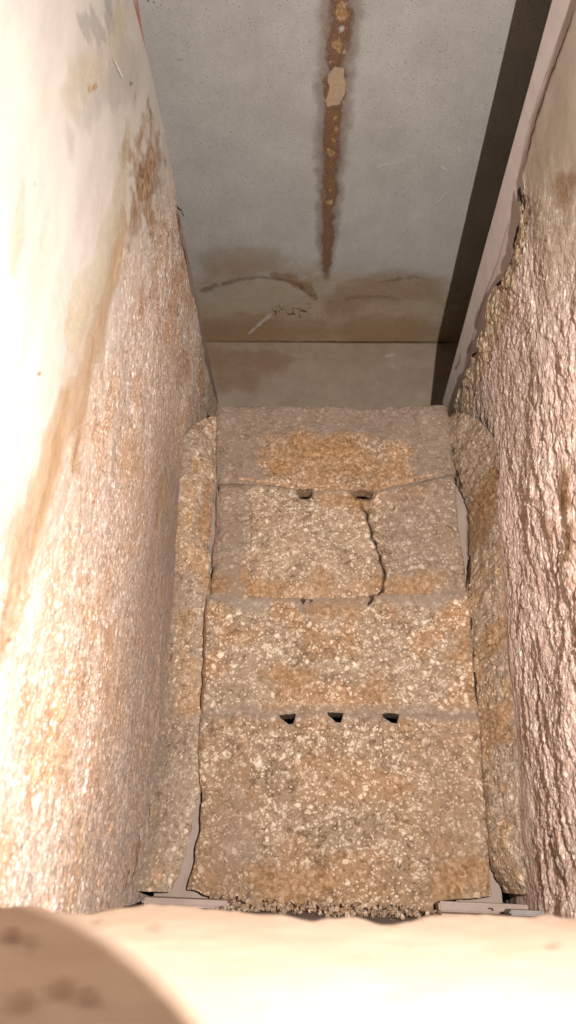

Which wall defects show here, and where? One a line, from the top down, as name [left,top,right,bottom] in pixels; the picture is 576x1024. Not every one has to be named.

corrosion [321,0,354,274]
leakage [200,276,467,343]
spalling [450,187,530,417]
crack [360,505,386,606]